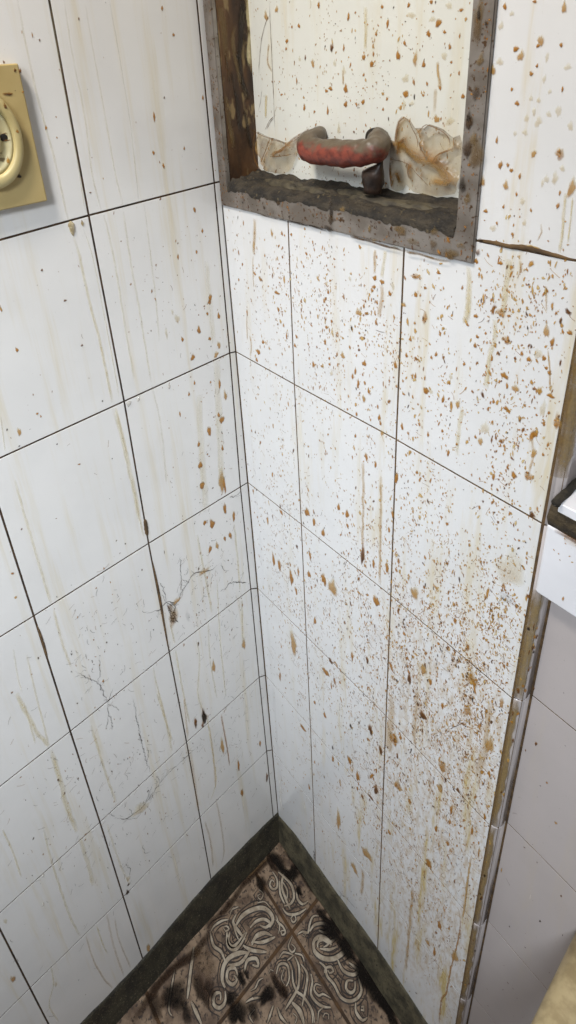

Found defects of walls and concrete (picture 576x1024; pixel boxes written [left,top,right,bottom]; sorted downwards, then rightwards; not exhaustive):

corrosion [227,0,576,1019]
crack [142,564,245,623]
leakage [142,938,206,1010]